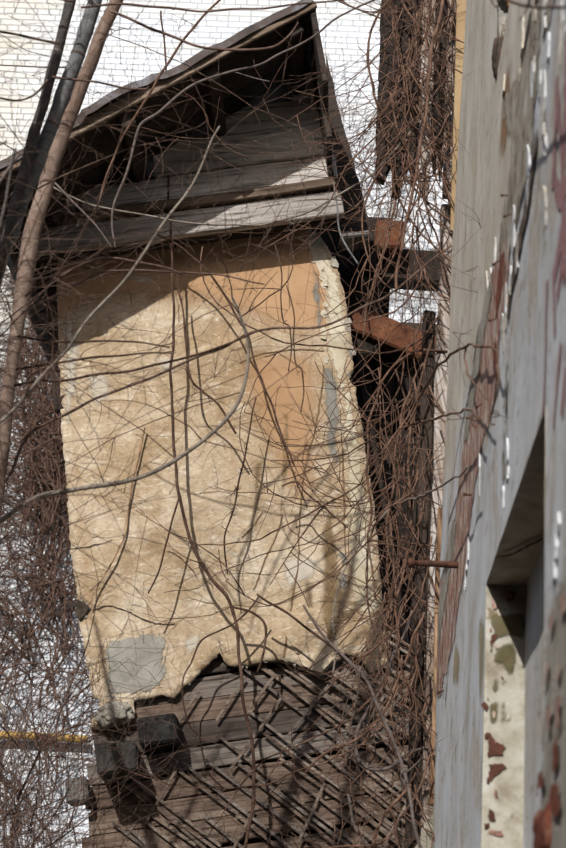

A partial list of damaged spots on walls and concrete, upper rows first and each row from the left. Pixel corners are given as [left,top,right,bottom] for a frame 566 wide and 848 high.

spalling [436,0,566,698]
spalling [284,647,333,672]
spalling [532,579,566,848]
spalling [484,732,506,798]
spalling [484,809,503,836]